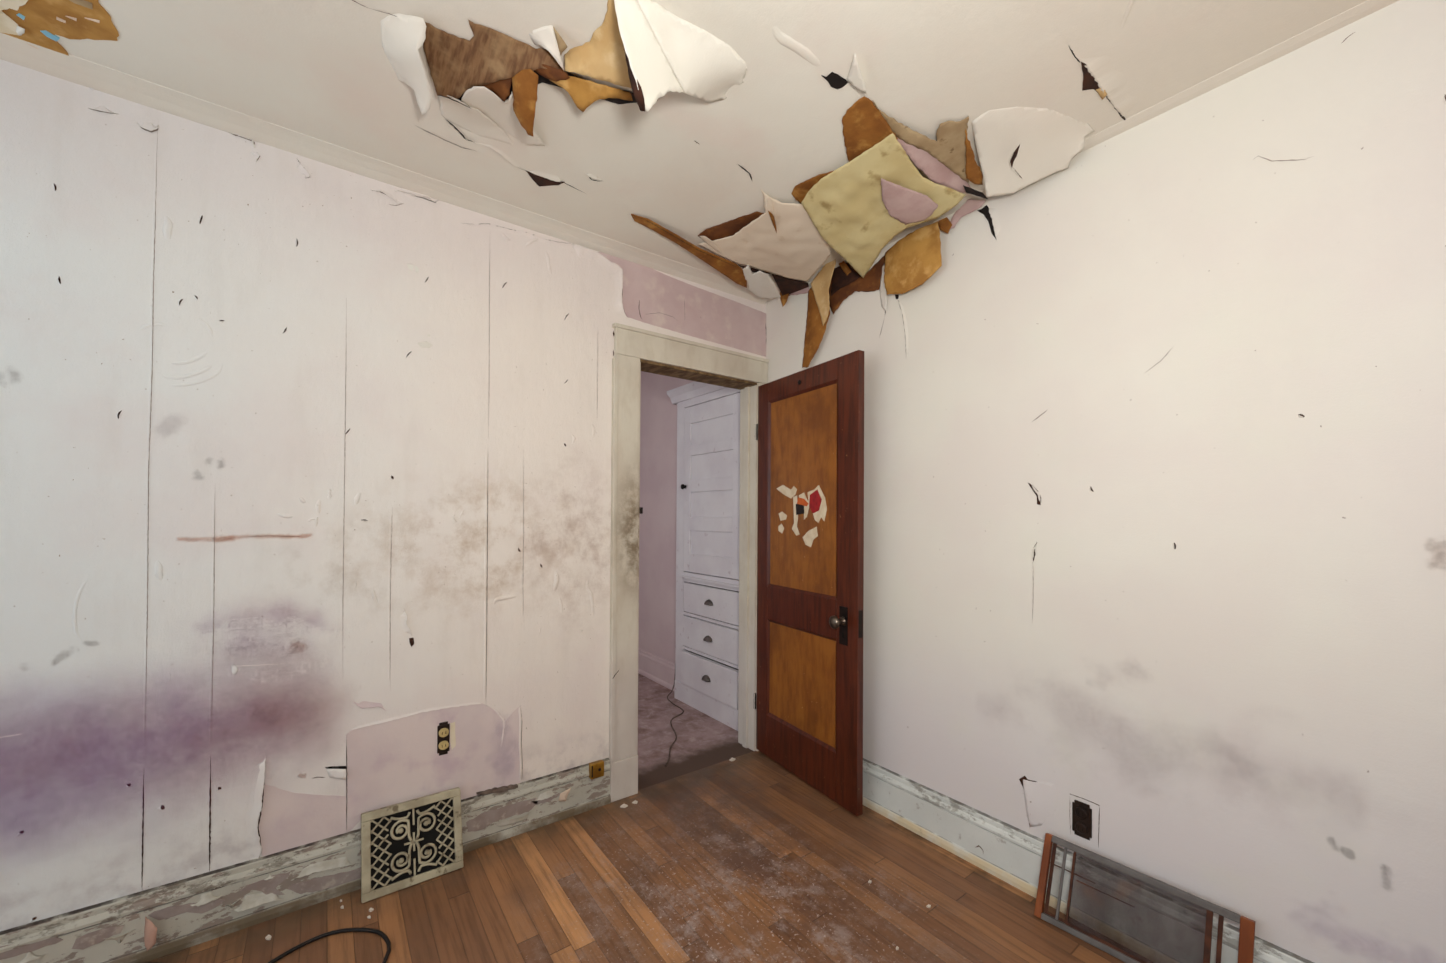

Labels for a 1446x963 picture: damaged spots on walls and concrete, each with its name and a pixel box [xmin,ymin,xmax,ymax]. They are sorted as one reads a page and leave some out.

spalling [0,0,28,11]
peeling [466,784,571,832]
peeling [0,857,361,963]